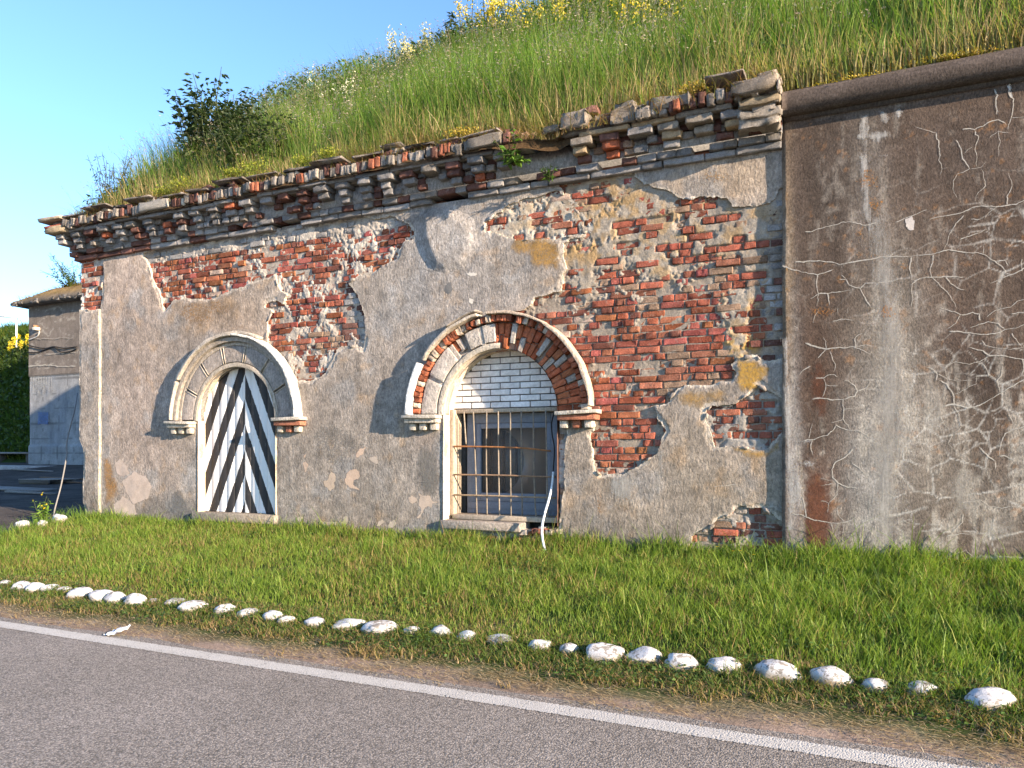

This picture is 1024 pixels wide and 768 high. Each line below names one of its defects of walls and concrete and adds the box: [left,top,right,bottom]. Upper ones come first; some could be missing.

flaking render [81,254,104,311]
flaking render [145,217,414,389]
flaking render [483,174,783,476]
crack [783,84,1024,544]
flaking render [687,506,782,554]
corrosion [807,475,827,547]
crack [948,500,1009,556]